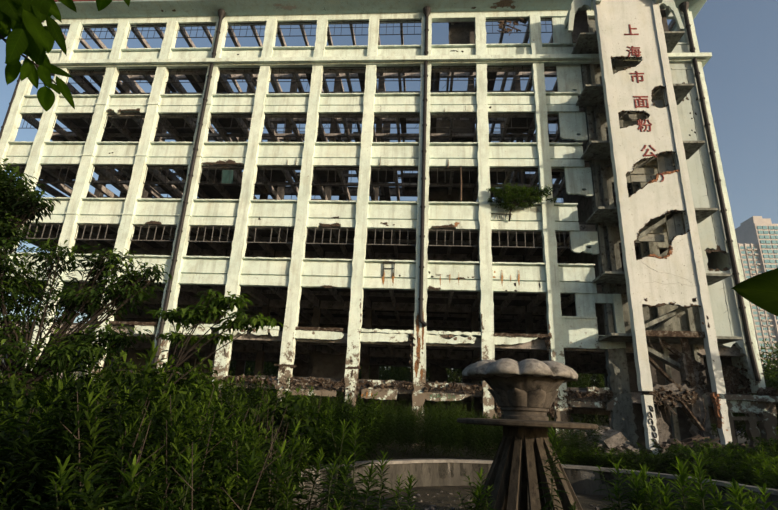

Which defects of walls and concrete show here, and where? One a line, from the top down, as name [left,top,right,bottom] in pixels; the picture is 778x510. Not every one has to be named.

spalling [618,85,669,128]
spalling [629,169,680,197]
spalling [634,209,690,260]
spalling [643,297,701,308]
rust [414,310,424,380]
flaking render [710,392,728,431]